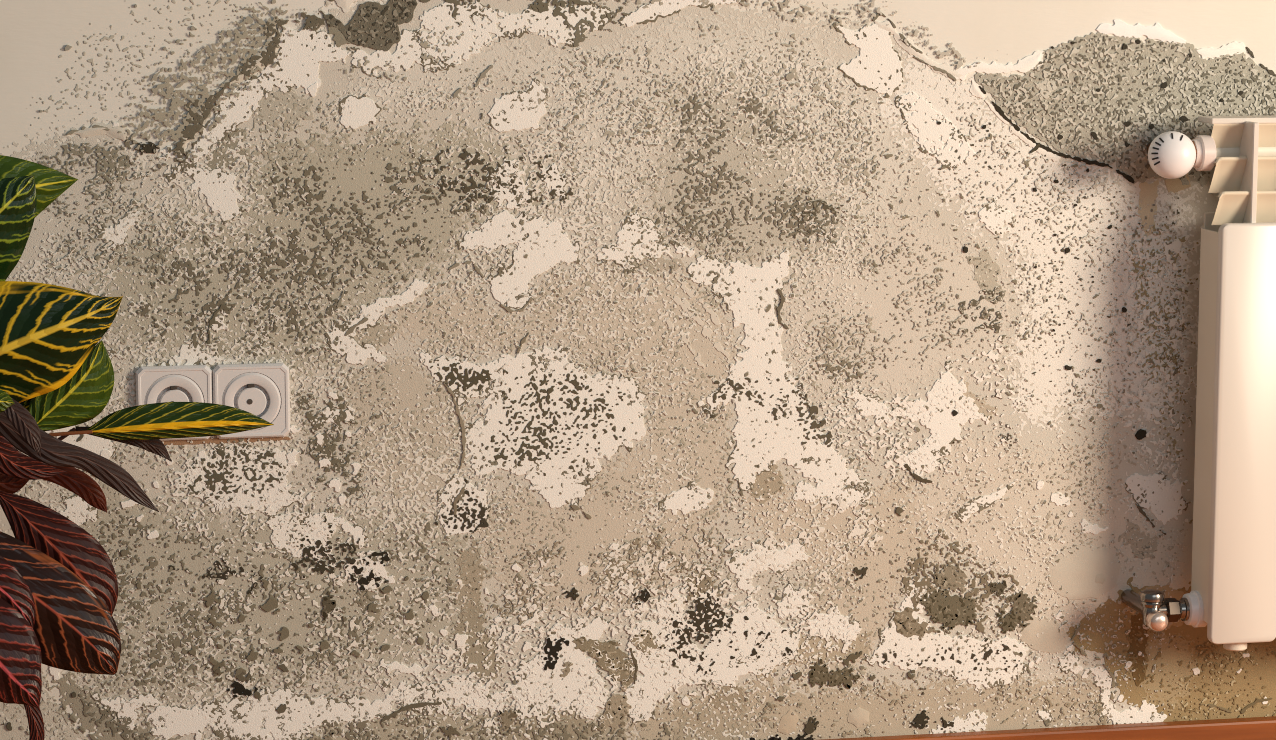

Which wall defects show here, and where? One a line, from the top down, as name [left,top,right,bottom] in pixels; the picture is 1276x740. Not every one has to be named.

crack [872,12,1135,183]
leakage [137,141,160,155]
spalling [0,0,1276,591]
peeling [134,399,1142,740]
leakage [726,543,761,597]
leakage [570,616,610,642]
leakage [912,602,931,629]
leakage [920,589,977,634]
leakage [596,594,800,740]
peeling [61,670,139,710]
leakage [0,702,29,740]